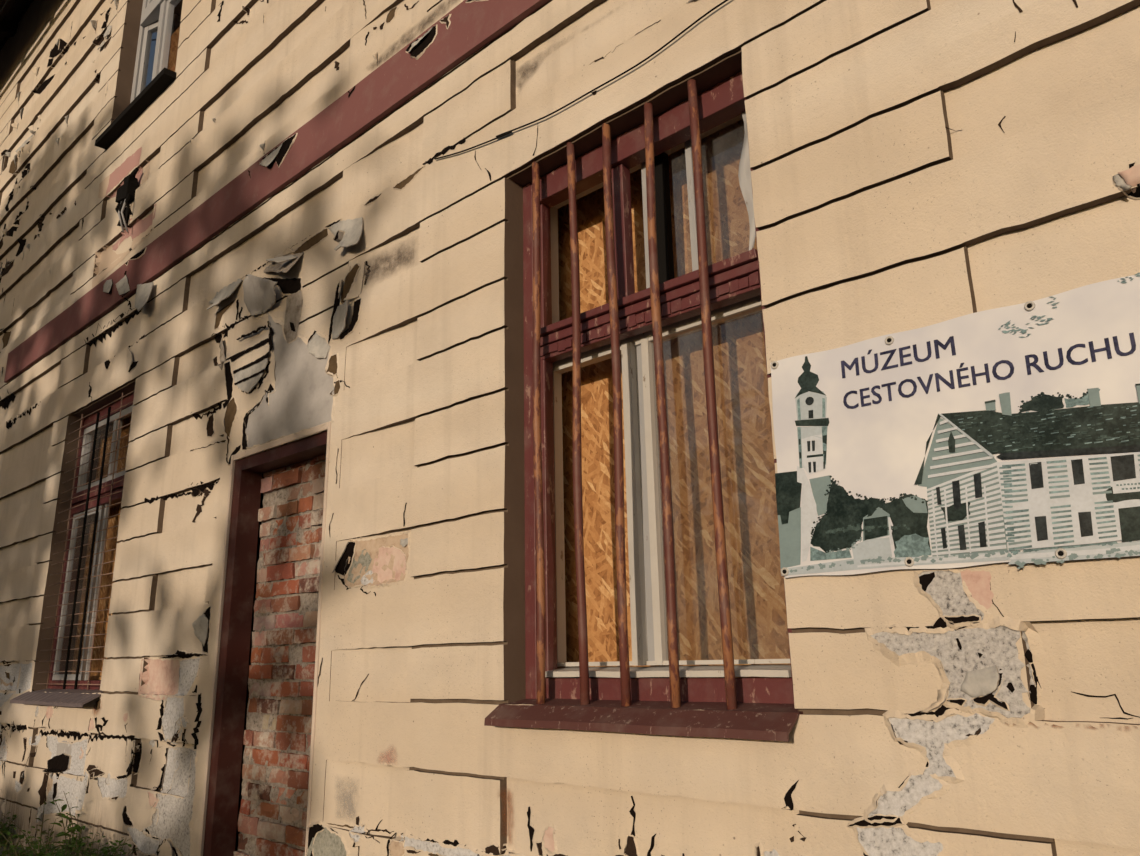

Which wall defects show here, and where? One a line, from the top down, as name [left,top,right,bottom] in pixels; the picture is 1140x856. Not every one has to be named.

crack [1013,0,1023,42]
peeling [1113,163,1140,200]
peeling [0,201,76,315]
peeling [191,133,466,466]
peeling [0,328,12,374]
peeling [332,531,411,596]
spalling [0,606,212,856]
spalling [847,568,1046,856]
crack [1072,692,1140,720]
spalling [542,823,568,856]
peeling [754,842,783,856]